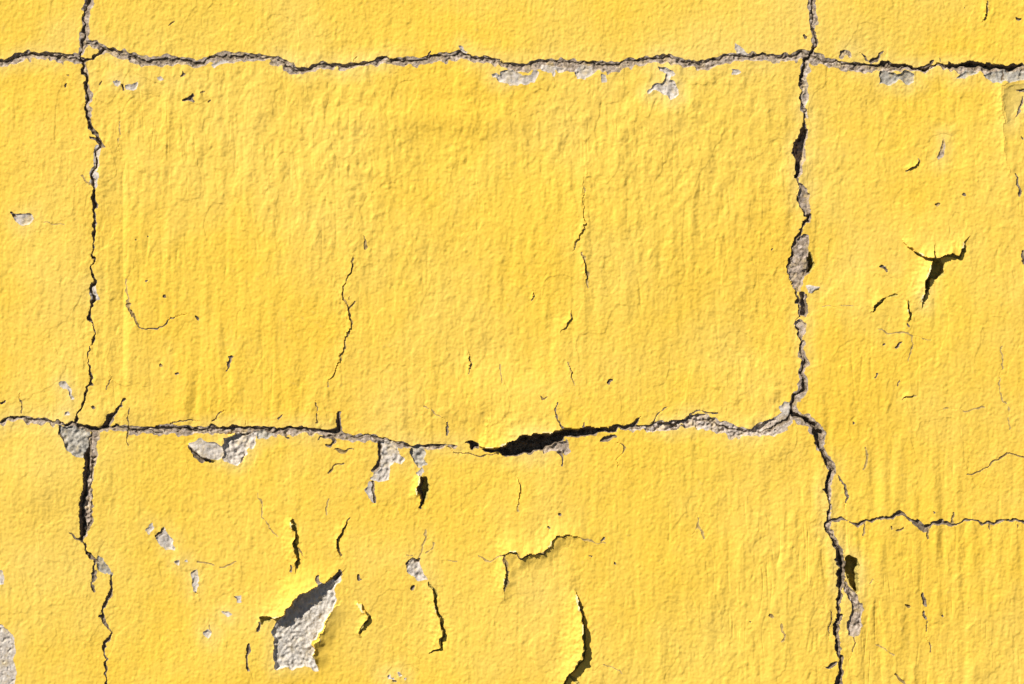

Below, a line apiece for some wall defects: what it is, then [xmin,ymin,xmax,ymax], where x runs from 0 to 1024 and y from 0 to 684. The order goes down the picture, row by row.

peeling [647,66,679,100]
crack [0,0,1024,345]
crack [327,236,368,388]
peeling [869,237,968,327]
spalling [188,430,274,466]
crack [417,443,458,451]
crack [0,360,411,684]
crack [448,319,864,684]
crack [849,510,1024,539]
peeling [0,624,17,684]
spalling [256,569,343,672]
peeling [405,530,446,654]